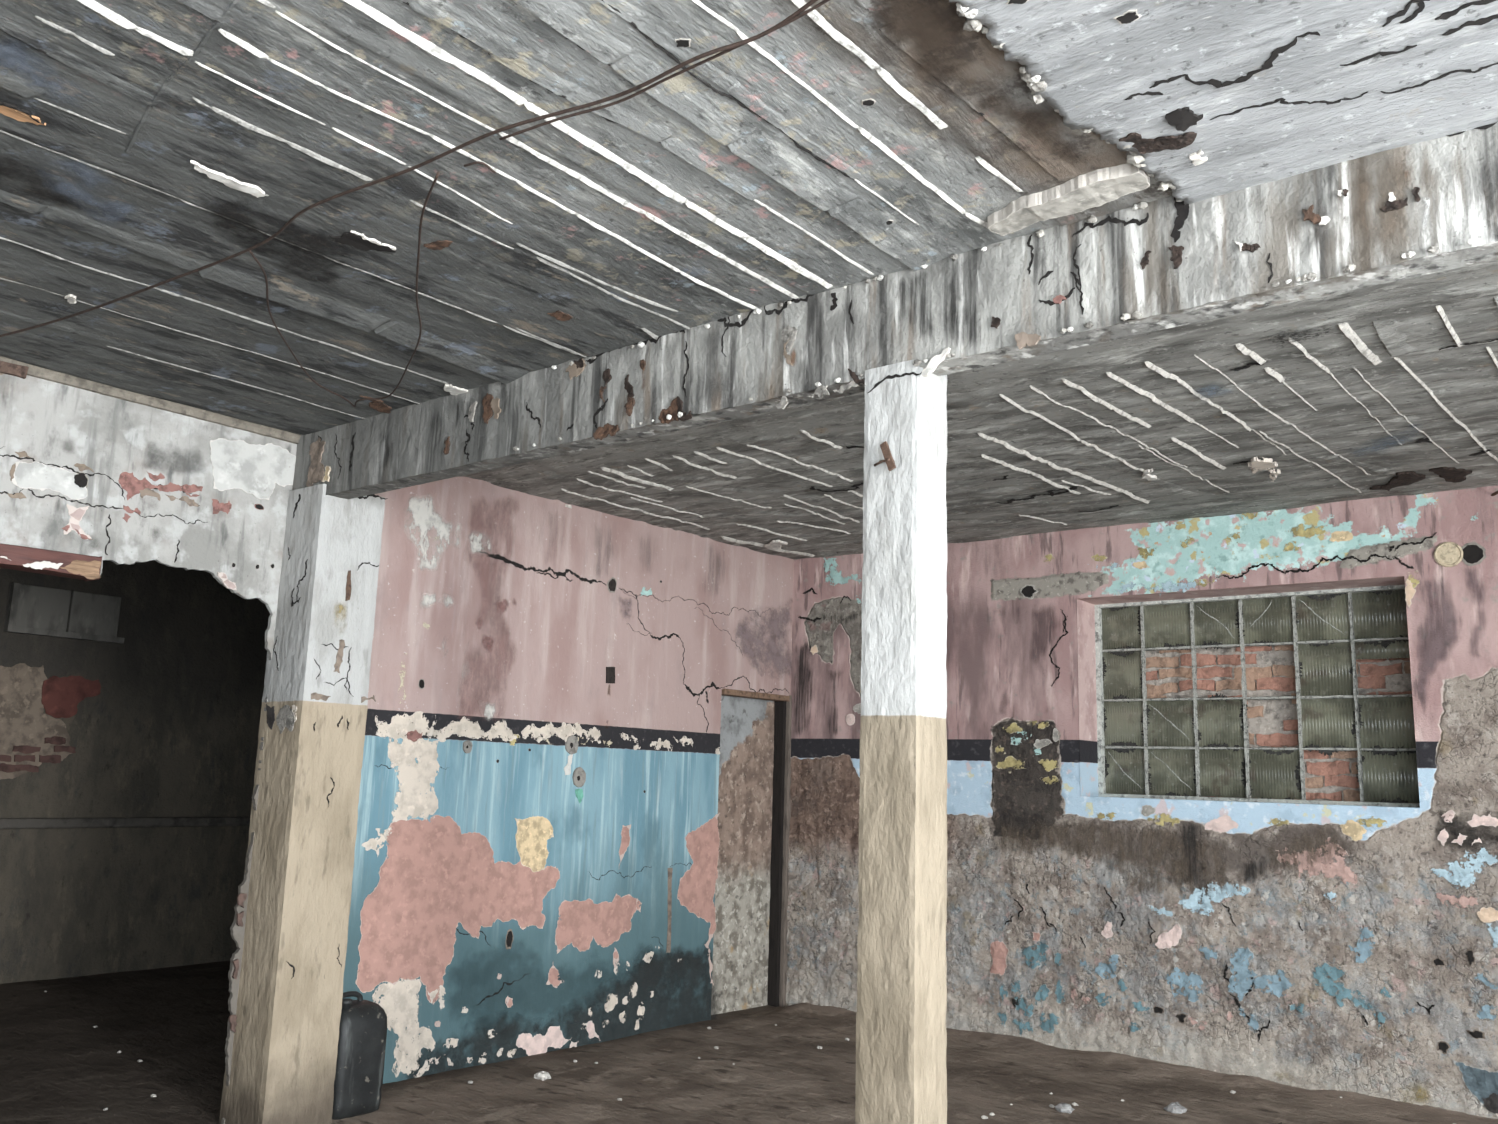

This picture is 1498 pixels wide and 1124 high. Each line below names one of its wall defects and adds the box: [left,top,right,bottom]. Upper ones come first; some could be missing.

crack [1125,0,1498,120]
crack [1447,122,1497,137]
crack [0,447,208,563]
flaking render [118,438,331,522]
peeling [0,556,101,580]
crack [475,551,851,735]
crack [1049,610,1068,687]
spalling [0,663,72,780]
peeling [995,720,1060,784]
peeling [355,695,693,1078]
peeling [1146,882,1251,949]
peeling [1427,810,1498,948]